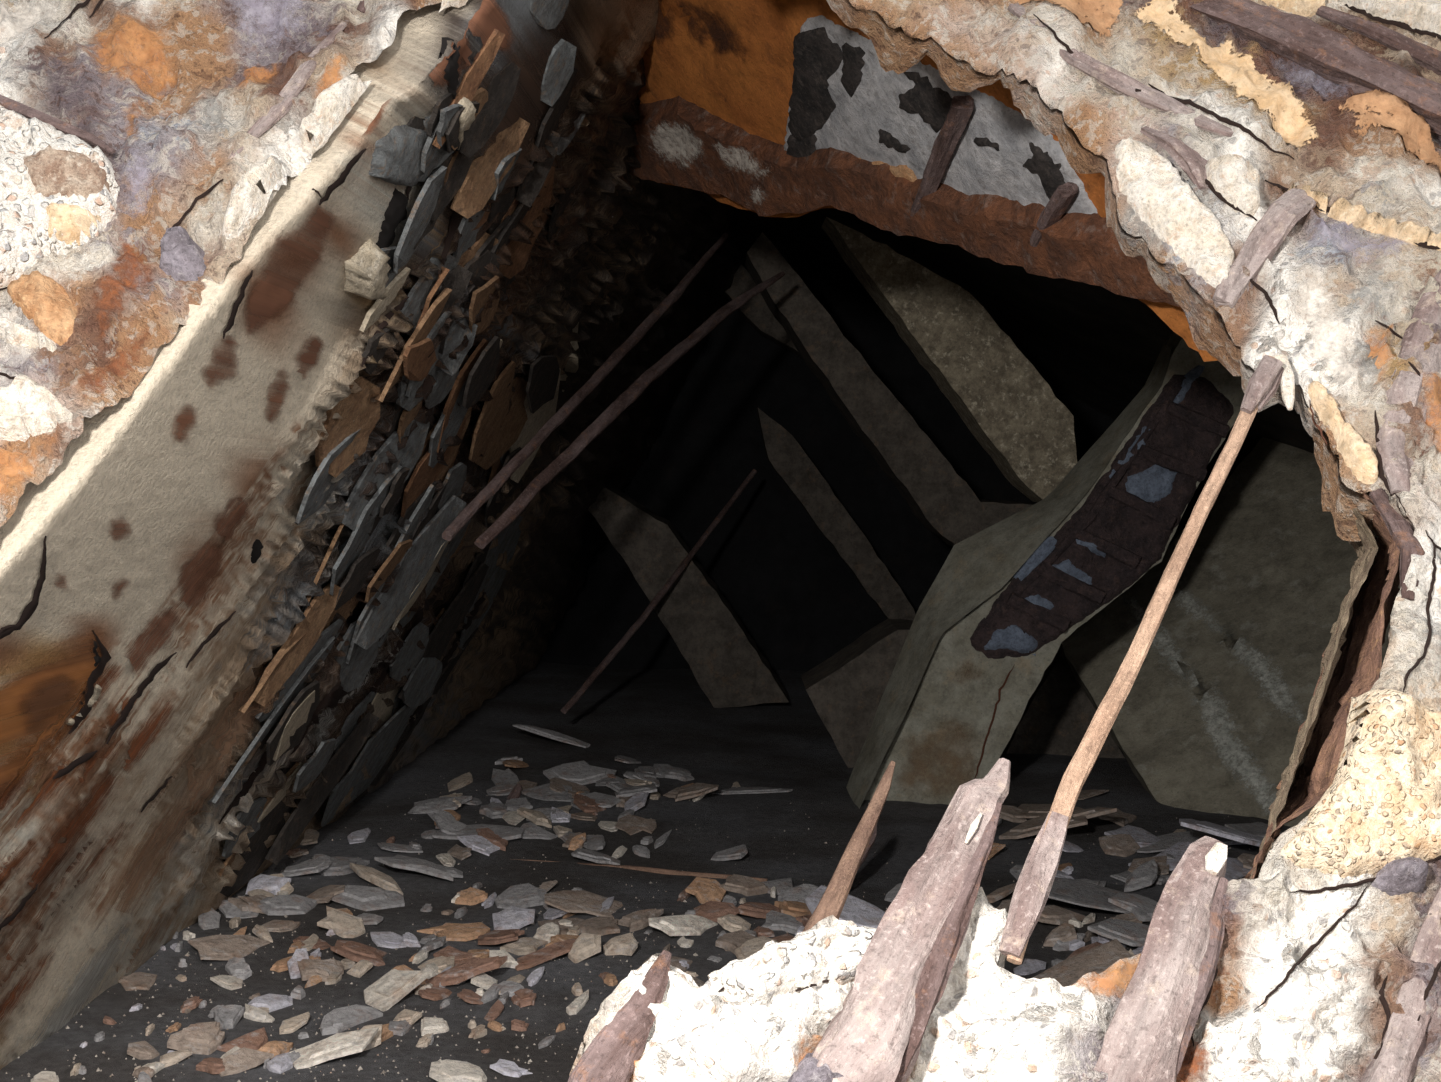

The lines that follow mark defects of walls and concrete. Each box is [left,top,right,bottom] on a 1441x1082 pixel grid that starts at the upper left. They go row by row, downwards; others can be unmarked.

peeling [784,15,1097,214]
peeling [1013,0,1318,149]
peeling [1262,0,1441,35]
spalling [1115,136,1261,288]
rust [204,206,334,385]
rust [267,337,323,421]
crack [0,536,47,639]
crack [1374,410,1441,692]
rust [0,497,248,1022]
crack [52,611,236,779]
crack [1255,877,1377,1010]
rust [31,1071,59,1082]